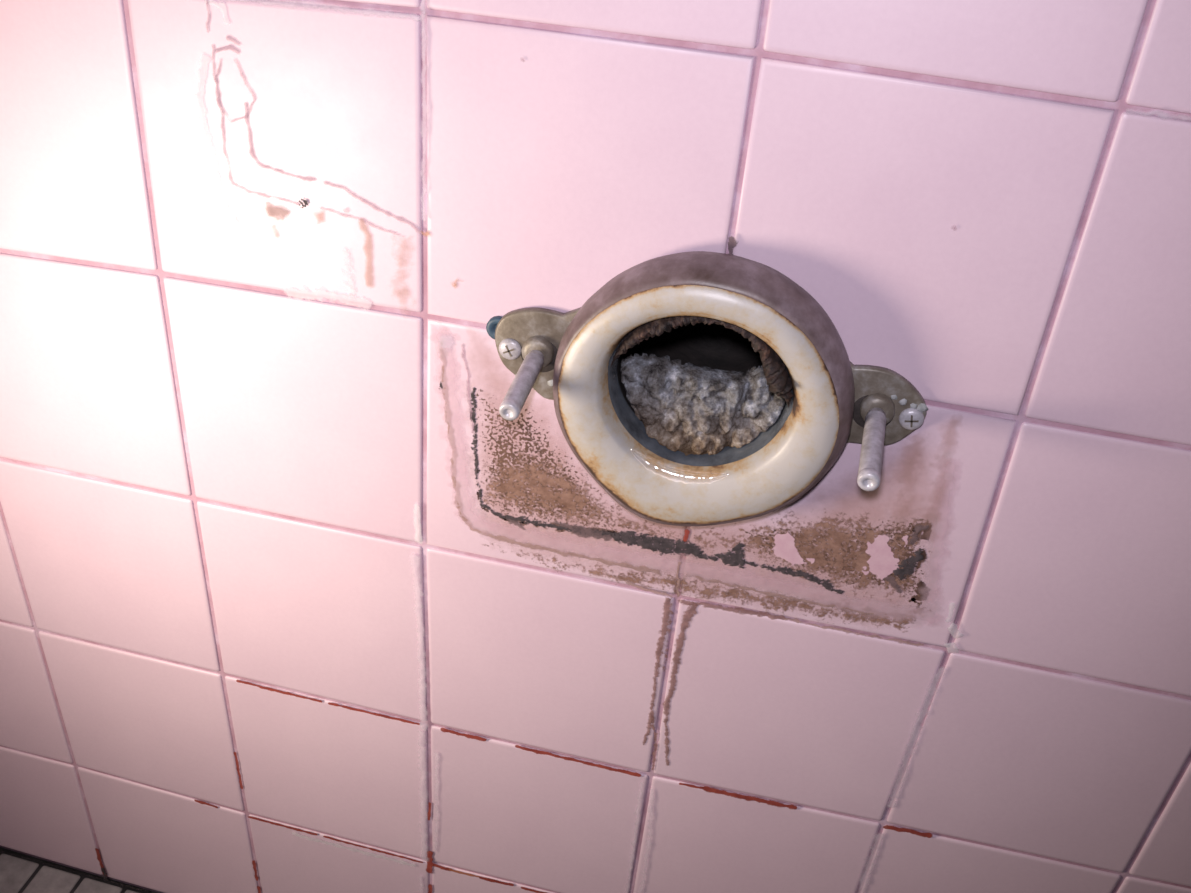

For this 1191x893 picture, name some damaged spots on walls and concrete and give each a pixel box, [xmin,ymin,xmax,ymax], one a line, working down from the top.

leakage [471,387,844,594]
peeling [772,532,815,565]
peeling [862,535,908,583]
leakage [883,525,929,593]
leakage [613,577,923,646]
crack [643,529,697,770]
rust [236,680,420,725]
rust [441,728,487,741]
rust [515,745,641,777]
rust [679,783,797,809]
rust [248,816,547,893]